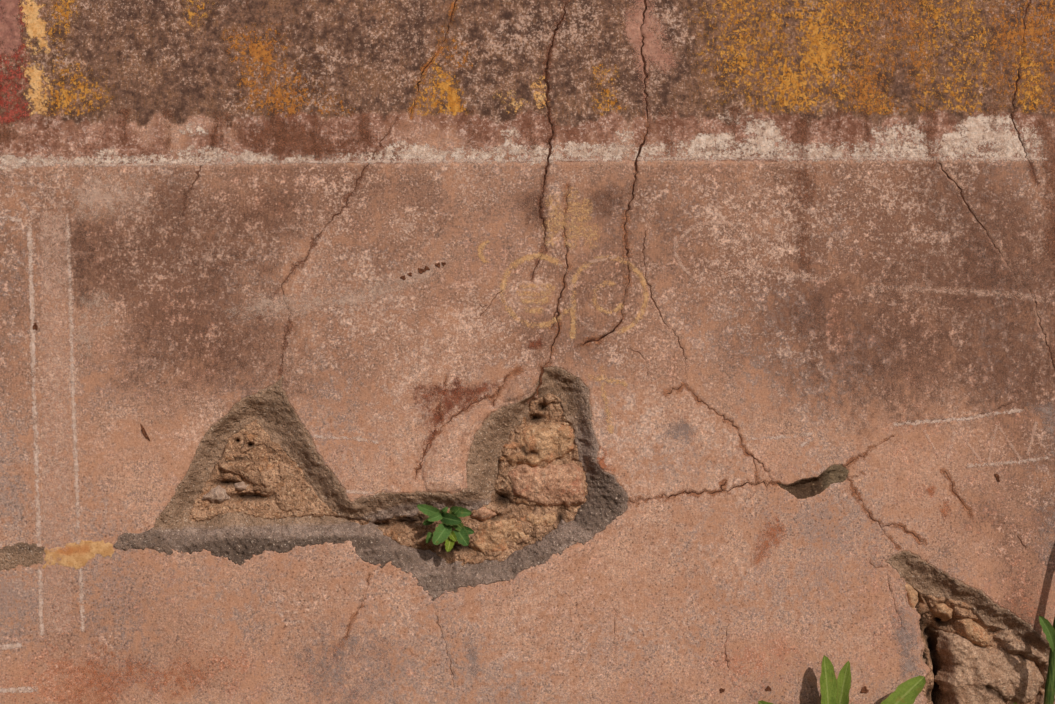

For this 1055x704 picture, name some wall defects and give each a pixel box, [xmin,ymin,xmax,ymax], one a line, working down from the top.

crack [256,0,460,375]
crack [414,0,781,507]
crack [936,161,1055,388]
crack [1008,0,1040,184]
spalling [153,366,628,601]
spalling [884,551,1055,704]